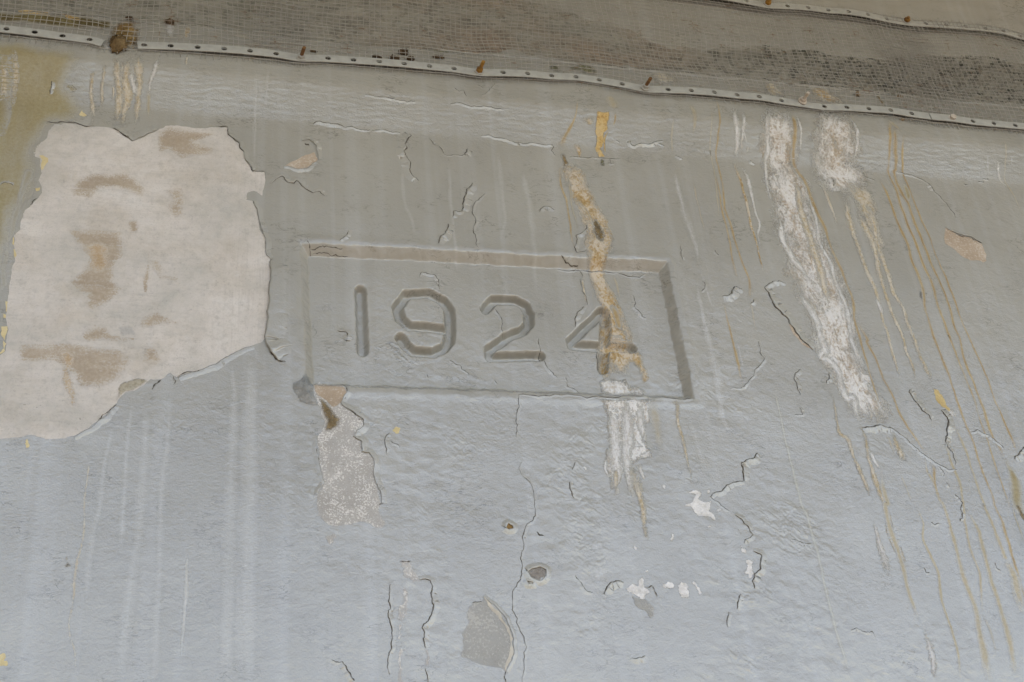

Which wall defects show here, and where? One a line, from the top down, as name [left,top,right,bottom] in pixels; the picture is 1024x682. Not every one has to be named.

rust [0,9,141,54]
peeling [0,111,292,448]
rust [558,94,650,382]
water stain [731,107,932,453]
peeling [944,226,986,262]
peeling [293,374,387,528]
crack [493,338,693,682]
water stain [587,378,665,541]
crack [709,453,767,627]
crack [862,389,1024,527]
crack [419,575,441,682]
peeling [461,594,518,681]